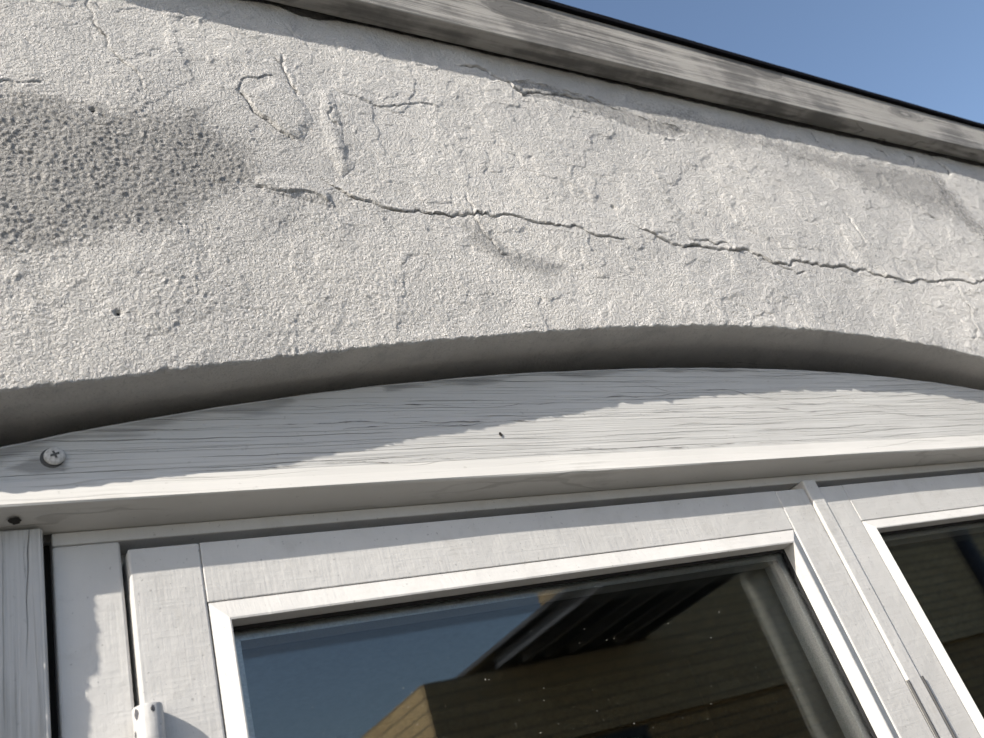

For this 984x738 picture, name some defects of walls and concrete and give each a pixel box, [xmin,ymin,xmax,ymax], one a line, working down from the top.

crack [240,59,298,139]
crack [458,62,589,108]
crack [324,180,984,306]